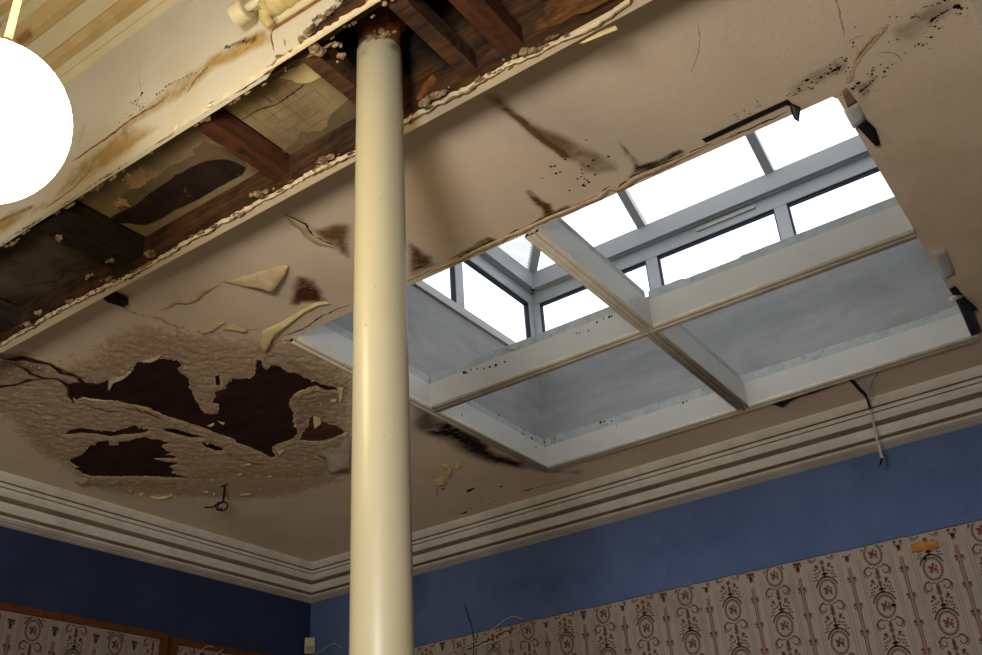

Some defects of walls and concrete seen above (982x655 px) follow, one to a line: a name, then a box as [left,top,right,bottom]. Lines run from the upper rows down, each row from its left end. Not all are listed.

spalling [219,0,395,105]
spalling [404,0,633,125]
mould [786,41,893,96]
crack [835,0,902,63]
mould [904,0,968,53]
leakage [45,33,265,209]
leakage [502,104,581,174]
leakage [635,151,682,172]
leakage [0,206,31,230]
spalling [0,147,356,347]
peeling [0,301,353,501]
leakage [431,423,518,465]